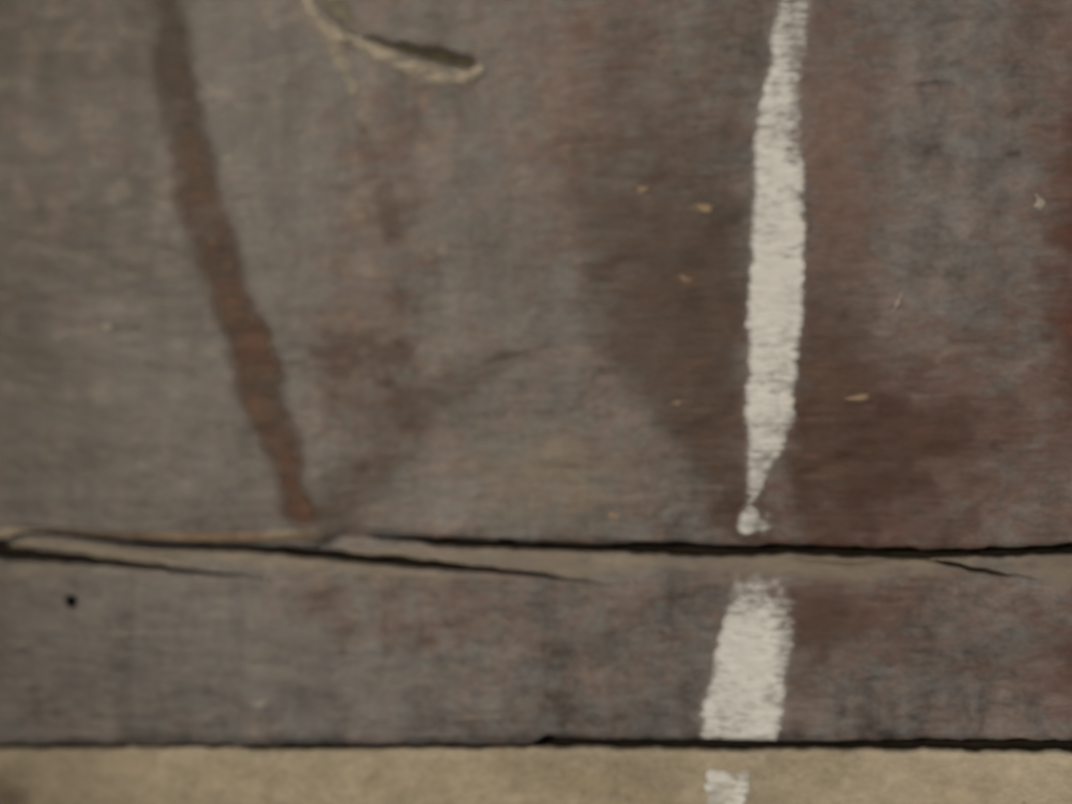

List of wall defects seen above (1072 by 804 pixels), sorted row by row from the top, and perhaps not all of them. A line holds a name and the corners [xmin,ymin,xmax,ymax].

corrosion [155,0,315,525]
water stain [589,3,807,540]
crack [0,532,1072,582]
water stain [701,583,792,741]
crack [0,735,1072,752]
water stain [704,770,749,804]